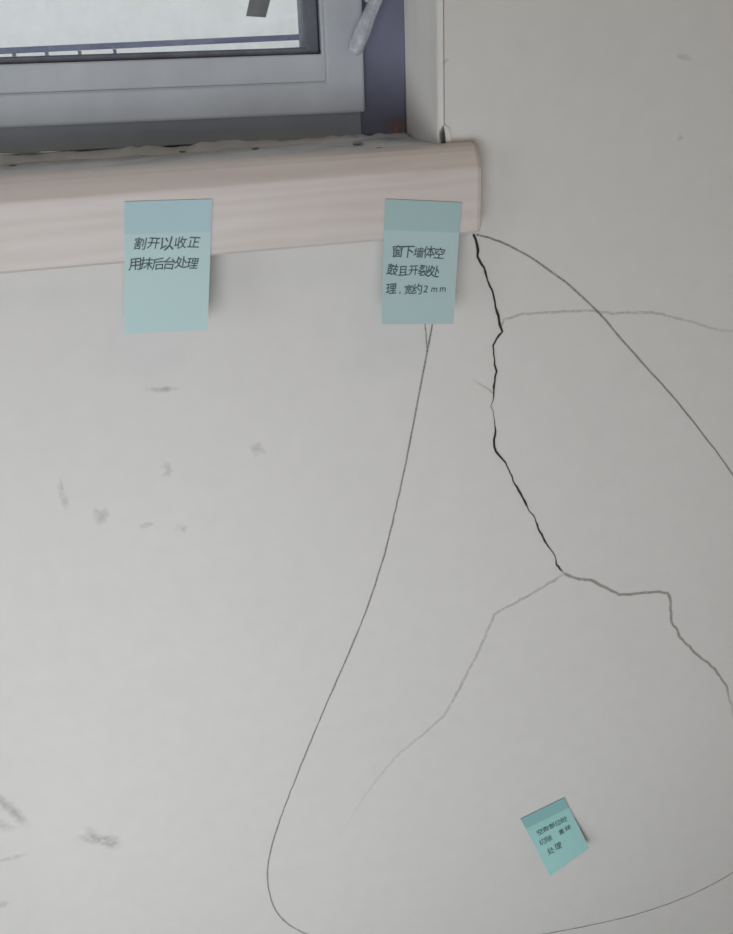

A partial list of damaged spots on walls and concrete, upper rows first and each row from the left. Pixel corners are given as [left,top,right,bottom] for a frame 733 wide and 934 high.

crack [473,234,720,676]